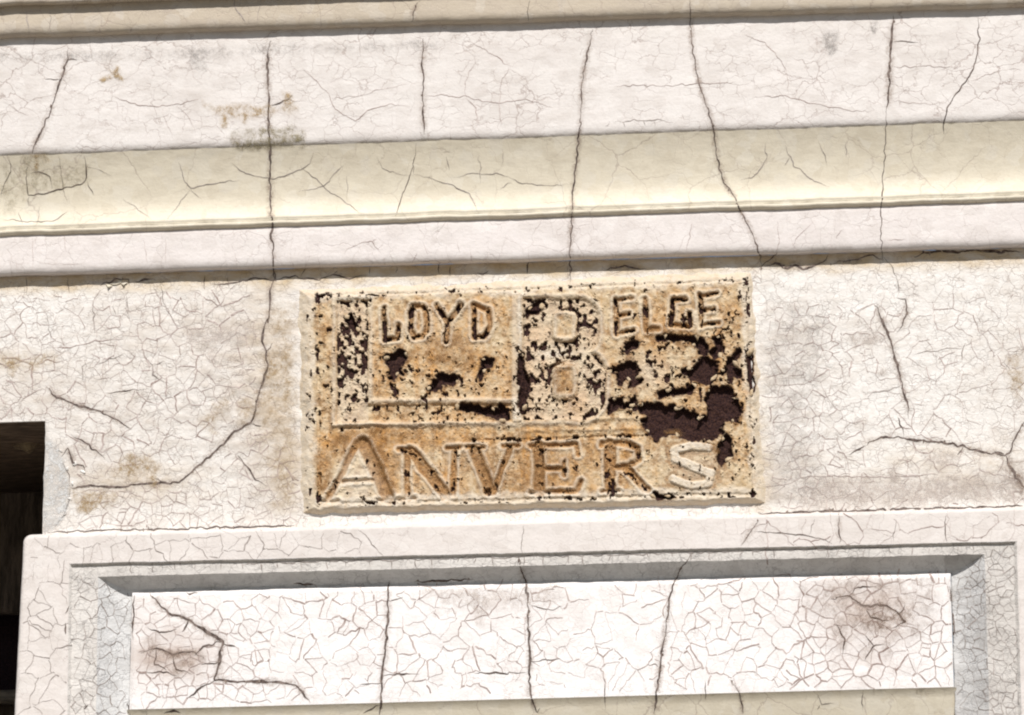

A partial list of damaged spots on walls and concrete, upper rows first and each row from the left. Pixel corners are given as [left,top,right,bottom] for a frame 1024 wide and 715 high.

crack [886,17,931,109]
crack [927,21,1017,131]
crack [309,2,593,280]
crack [617,8,899,289]
crack [0,41,488,573]
spalling [525,299,545,319]
spalling [382,349,408,383]
spalling [426,371,459,393]
spalling [455,346,532,424]
spalling [606,333,757,468]
crack [20,292,1024,715]
spalling [649,491,677,501]